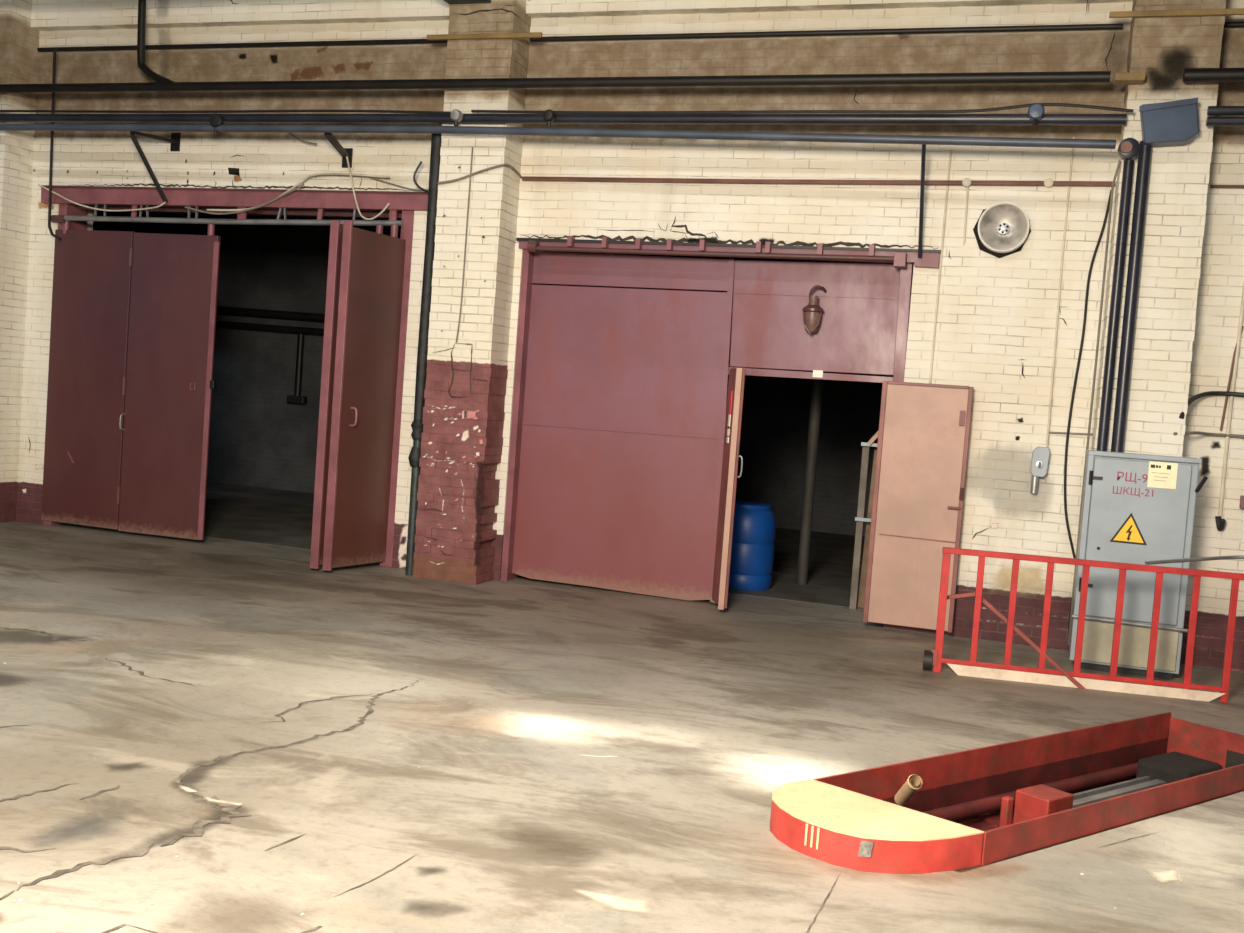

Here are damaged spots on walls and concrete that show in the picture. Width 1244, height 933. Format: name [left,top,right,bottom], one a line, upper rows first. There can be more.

spalling [423,405,484,565]
crack [0,627,198,687]
crack [0,679,423,900]